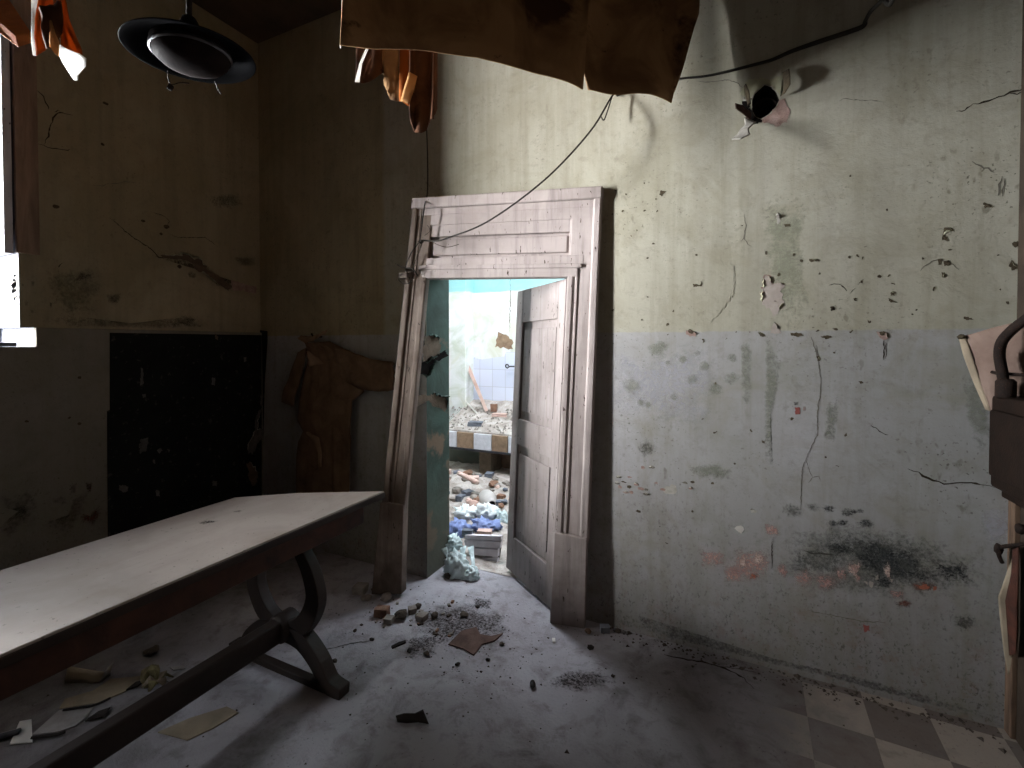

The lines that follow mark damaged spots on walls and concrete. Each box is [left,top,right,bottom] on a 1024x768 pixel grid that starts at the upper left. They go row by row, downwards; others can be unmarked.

spalling [732,69,791,140]
crack [961,89,1021,112]
crack [109,213,257,294]
peeling [760,273,785,316]
flaking render [421,334,449,377]
flaking render [417,392,450,412]
crack [800,337,821,509]
crack [909,469,995,488]
damp [789,505,965,592]